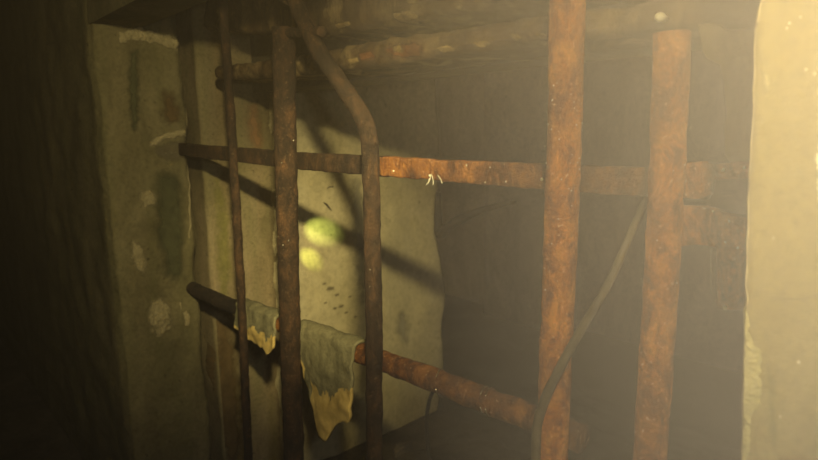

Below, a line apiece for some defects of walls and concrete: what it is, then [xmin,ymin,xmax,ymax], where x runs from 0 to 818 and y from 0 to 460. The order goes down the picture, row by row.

spalling [119,27,179,50]
peeling [149,299,191,337]